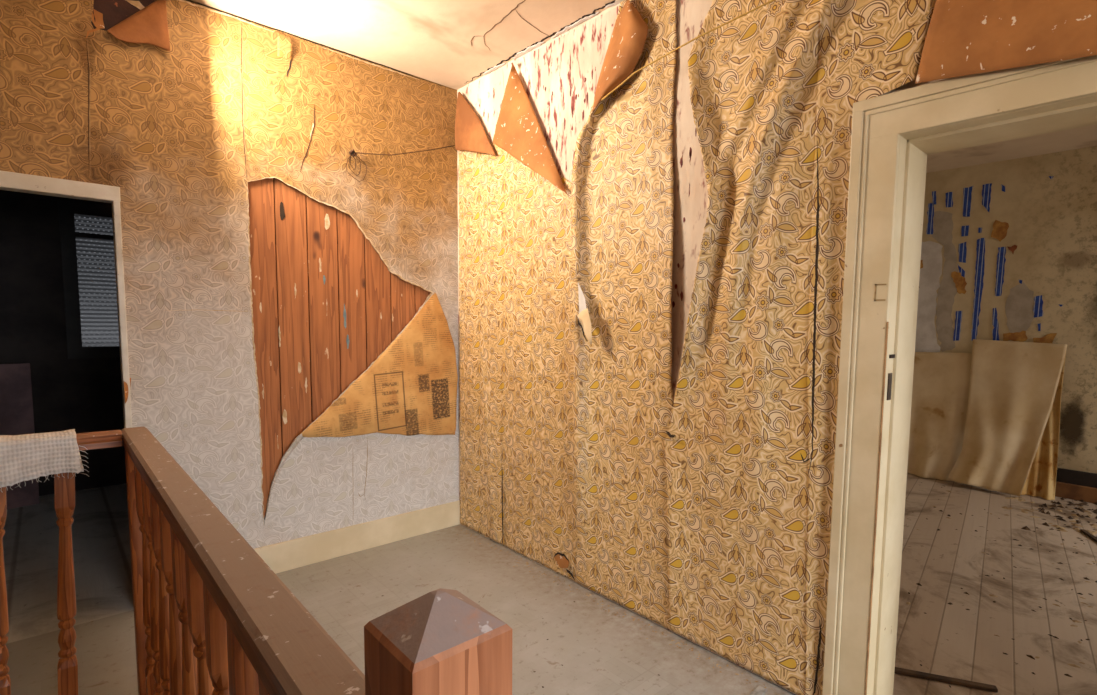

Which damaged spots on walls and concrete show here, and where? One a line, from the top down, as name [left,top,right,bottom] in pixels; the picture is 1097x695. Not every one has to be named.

crack [471,0,547,45]
peeling [915,0,1097,84]
flaking render [455,0,648,196]
flaking render [671,0,713,400]
peeling [578,283,592,344]
flaking render [915,241,943,352]
damp [1060,403,1085,454]